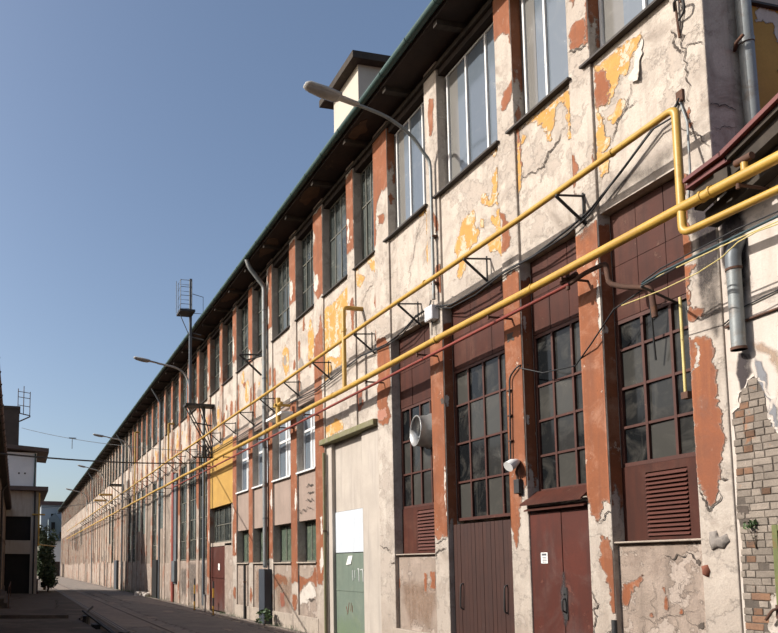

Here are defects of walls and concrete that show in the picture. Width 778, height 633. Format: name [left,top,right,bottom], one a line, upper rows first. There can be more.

peeling [313,206,323,299]
peeling [346,170,354,255]
peeling [356,128,395,288]
peeling [454,167,511,279]
peeling [492,0,571,194]
crack [521,128,563,181]
peeling [567,0,600,54]
peeling [591,32,644,179]
peeling [132,286,354,611]
peeling [576,220,623,524]
flaking render [689,335,778,633]
leakage [736,343,778,430]